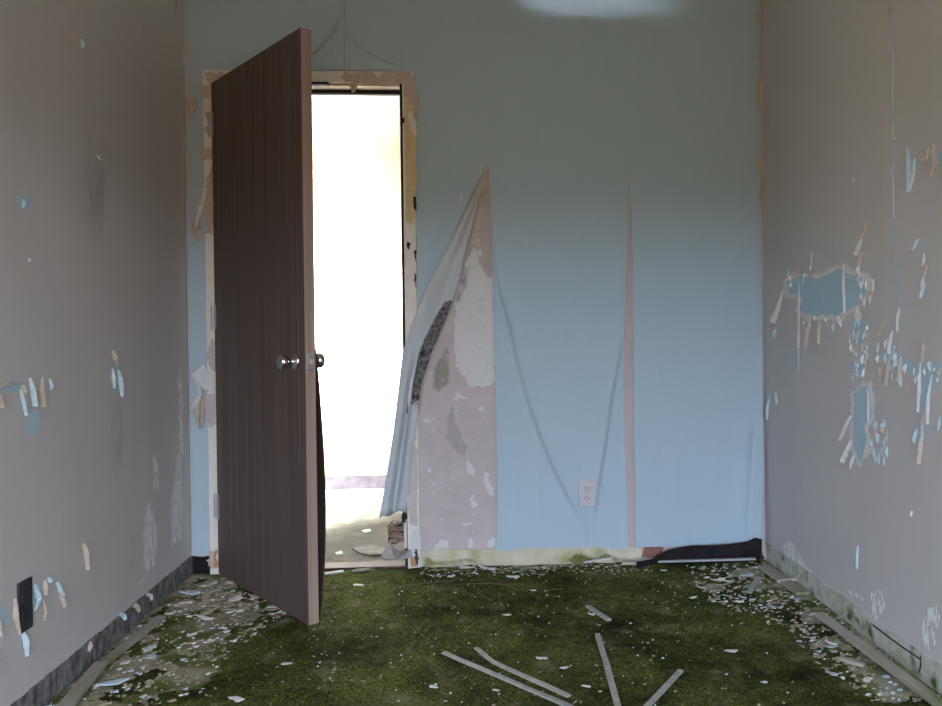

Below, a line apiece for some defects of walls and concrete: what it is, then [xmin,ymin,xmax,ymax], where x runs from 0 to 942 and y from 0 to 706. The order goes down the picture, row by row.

peeling [768,0,942,469]
peeling [423,248,495,506]
peeling [764,391,778,420]